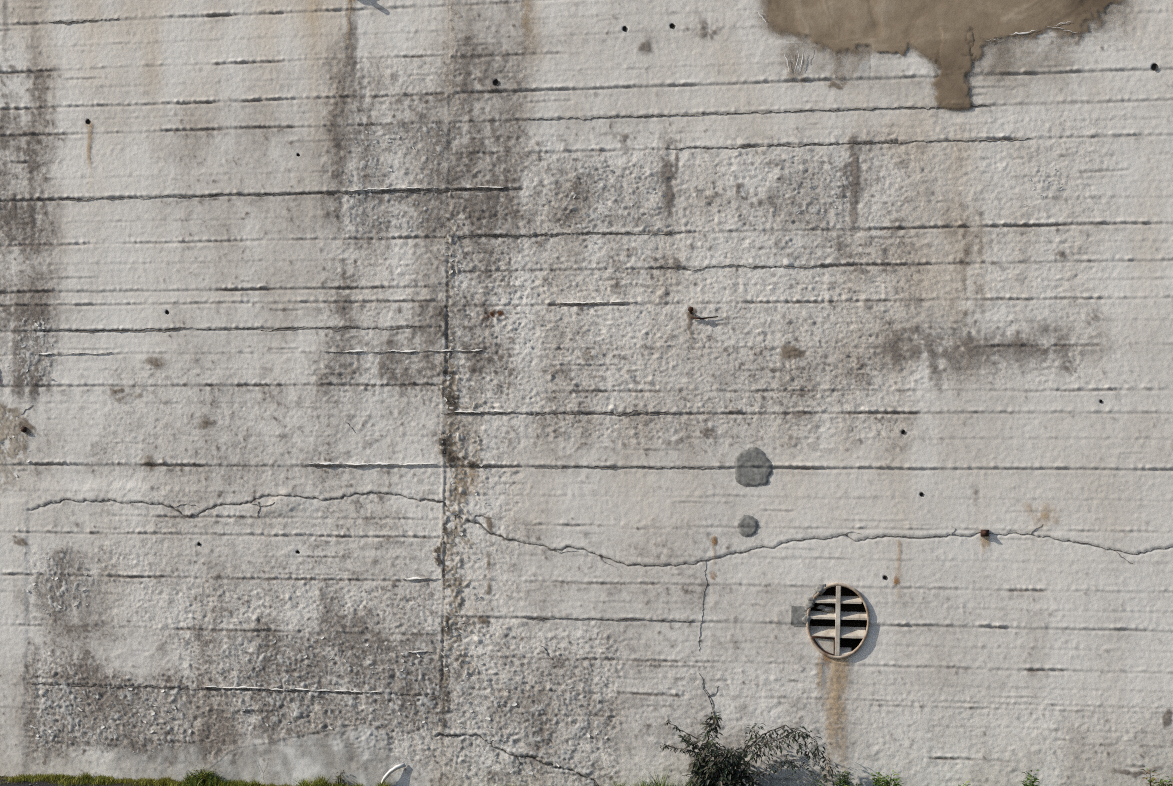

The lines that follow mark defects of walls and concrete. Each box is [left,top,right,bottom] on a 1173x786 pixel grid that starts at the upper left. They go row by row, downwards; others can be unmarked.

leakage [340,8,361,114]
leakage [661,154,678,210]
leakage [841,137,860,222]
leakage [781,346,804,359]
leakage [883,327,1046,379]
spalling [0,404,30,486]
crack [37,492,1173,657]
leakage [48,688,157,753]
leakage [277,627,428,714]
crack [437,733,598,786]
corrosion [818,655,848,746]